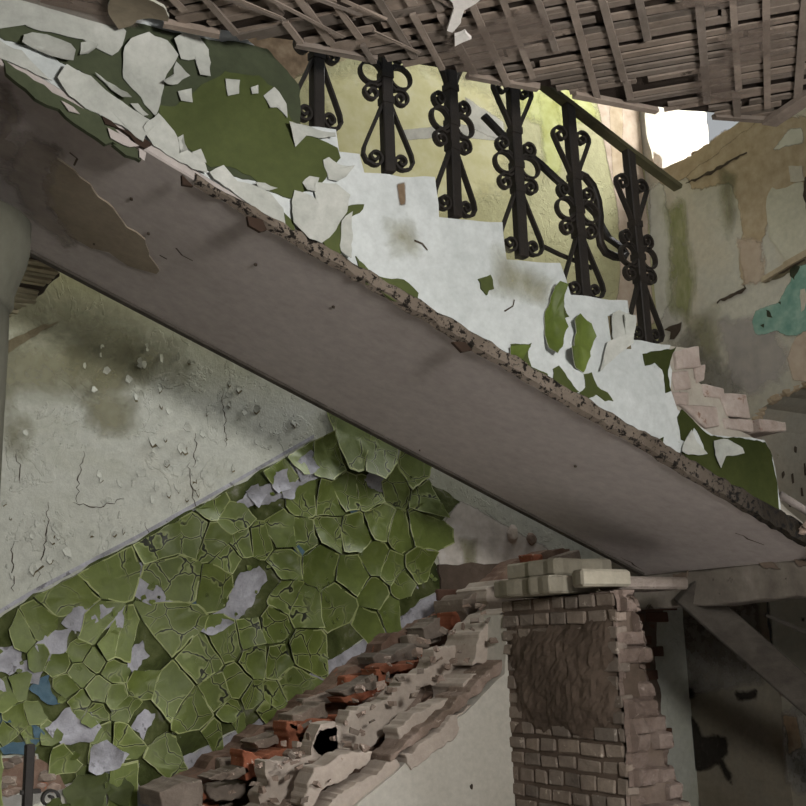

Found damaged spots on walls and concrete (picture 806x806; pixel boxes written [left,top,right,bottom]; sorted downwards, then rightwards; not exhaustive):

peeling [0,0,369,270]
flaking render [653,116,806,285]
crack [798,177,806,203]
leakage [669,202,692,314]
leakage [6,307,167,429]
peeling [510,281,637,401]
leakage [681,310,785,394]
crack [76,453,119,508]
crack [187,433,197,506]
peeling [677,409,779,509]
crack [37,506,49,580]
peeling [0,412,548,806]